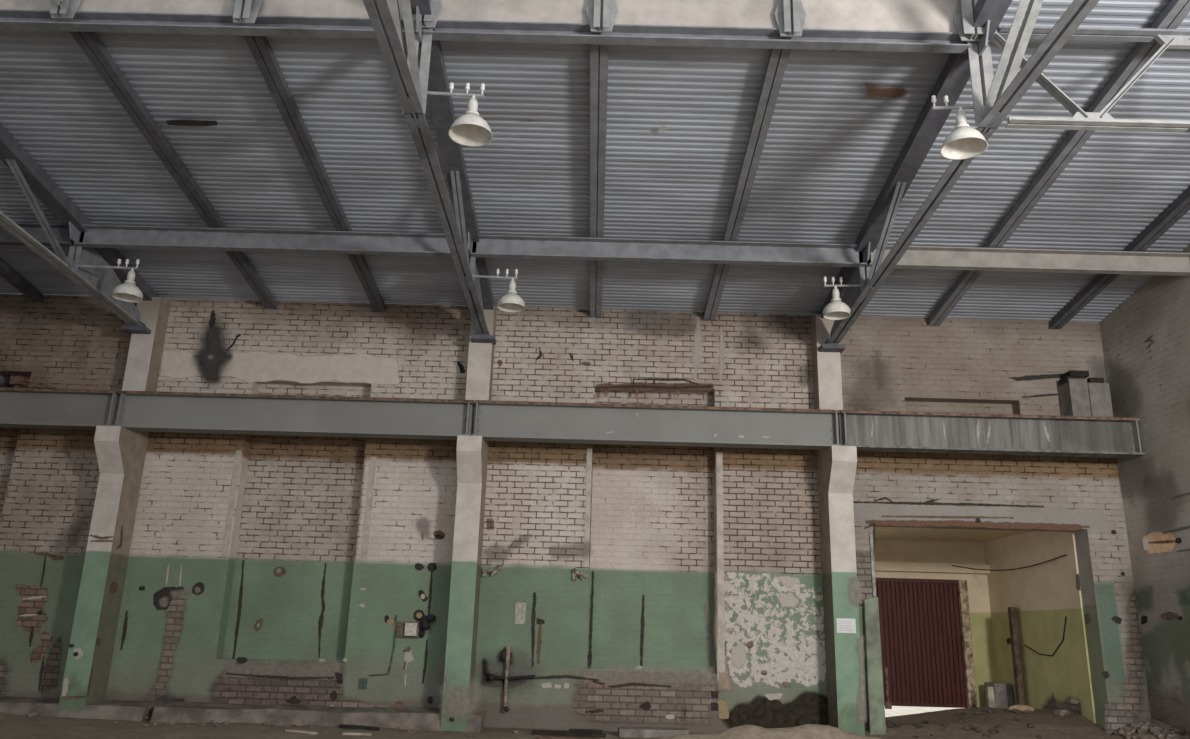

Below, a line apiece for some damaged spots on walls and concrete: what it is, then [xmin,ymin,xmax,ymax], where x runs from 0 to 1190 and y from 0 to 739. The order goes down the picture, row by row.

rust [865,84,908,98]
spalling [16,584,85,699]
crack [232,560,245,659]
flaking render [211,657,406,707]
crack [318,563,326,662]
peeling [403,647,413,688]
crack [587,571,595,669]
crack [636,595,645,670]
peeling [541,572,826,723]
flaking render [1106,589,1190,736]